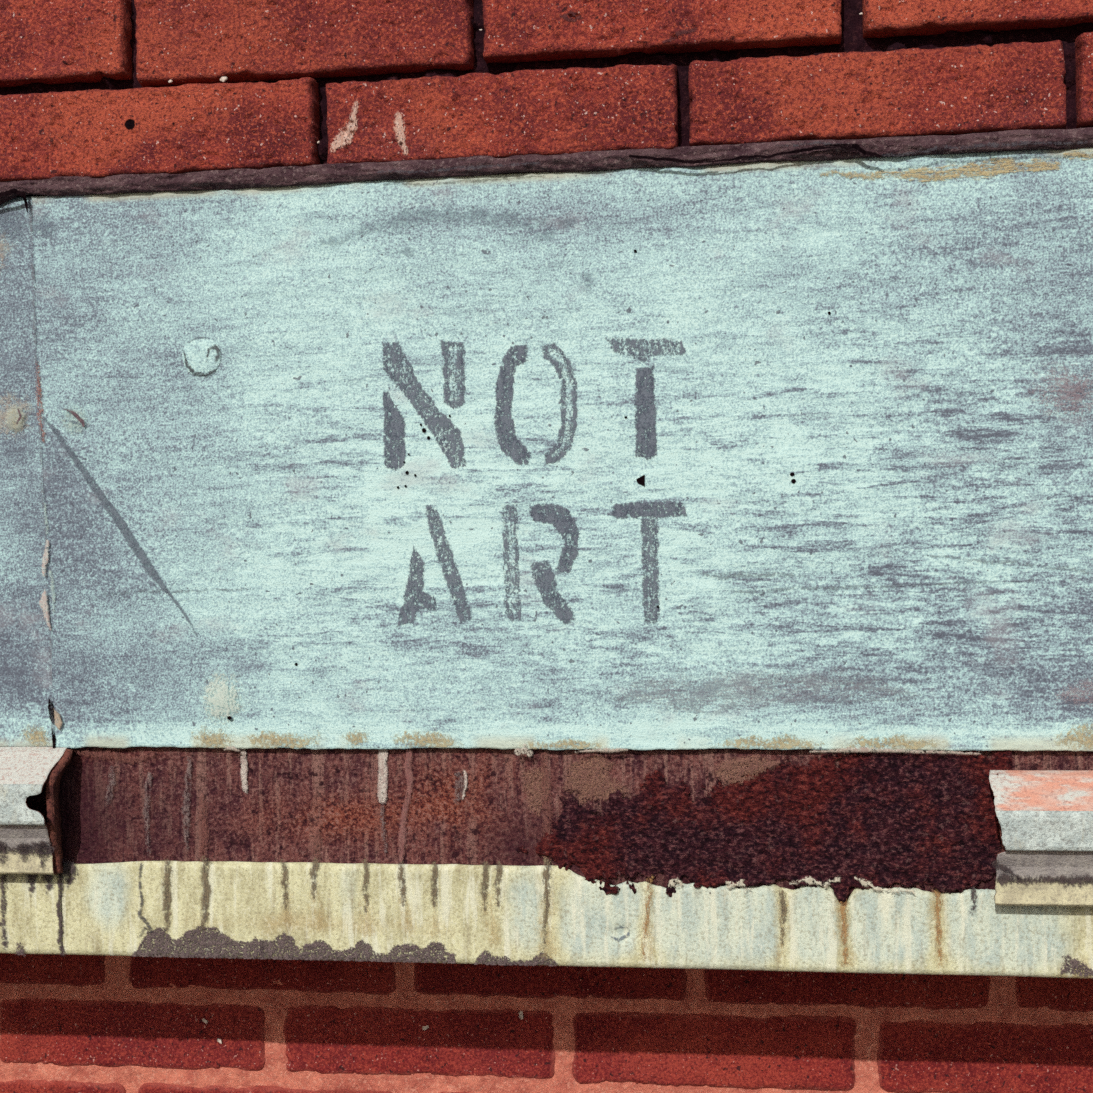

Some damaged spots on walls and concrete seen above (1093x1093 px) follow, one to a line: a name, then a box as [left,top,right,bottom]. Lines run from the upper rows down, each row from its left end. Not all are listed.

water stain [0,840,78,956]
water stain [162,859,172,931]
water stain [200,858,211,929]
water stain [309,857,319,899]
corrosion [27,724,1093,964]